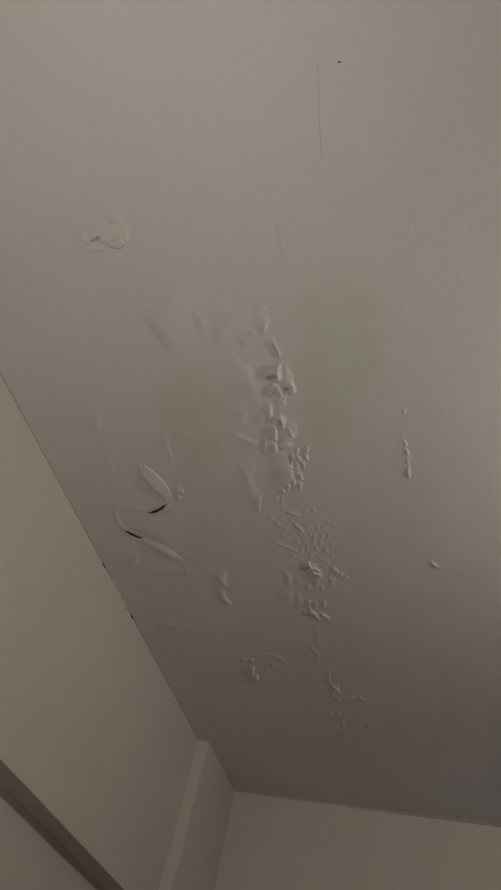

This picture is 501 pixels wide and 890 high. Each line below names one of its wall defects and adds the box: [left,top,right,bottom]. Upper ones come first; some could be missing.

peeling [260,333,309,496]